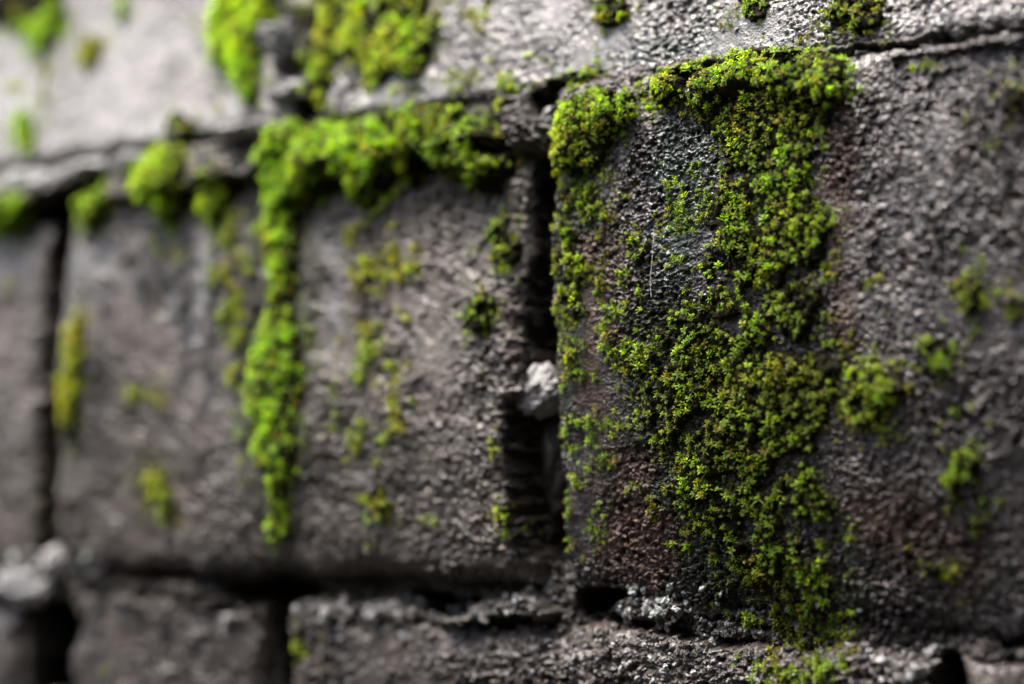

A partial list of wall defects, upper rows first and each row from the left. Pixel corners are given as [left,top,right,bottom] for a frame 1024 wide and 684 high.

damp [811,599,1024,641]